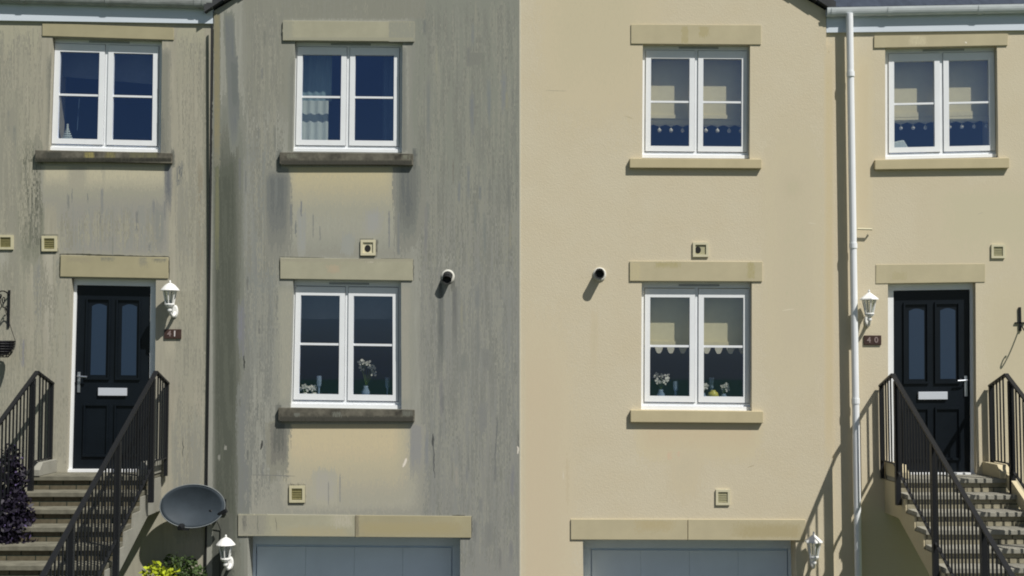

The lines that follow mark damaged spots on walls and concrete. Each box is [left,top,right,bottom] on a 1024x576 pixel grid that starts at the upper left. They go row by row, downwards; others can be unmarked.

leakage [0,0,709,576]